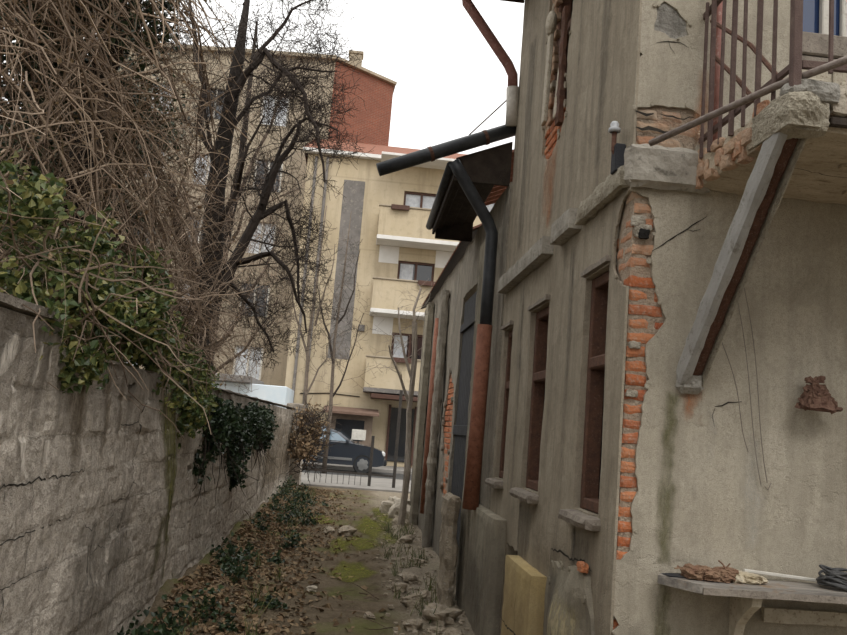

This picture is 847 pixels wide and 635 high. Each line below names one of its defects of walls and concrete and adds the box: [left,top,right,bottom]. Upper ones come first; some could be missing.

flaking render [542,0,571,159]
flaking render [632,102,701,148]
spalling [695,79,847,189]
flaking render [613,191,663,560]
crack [0,391,148,635]